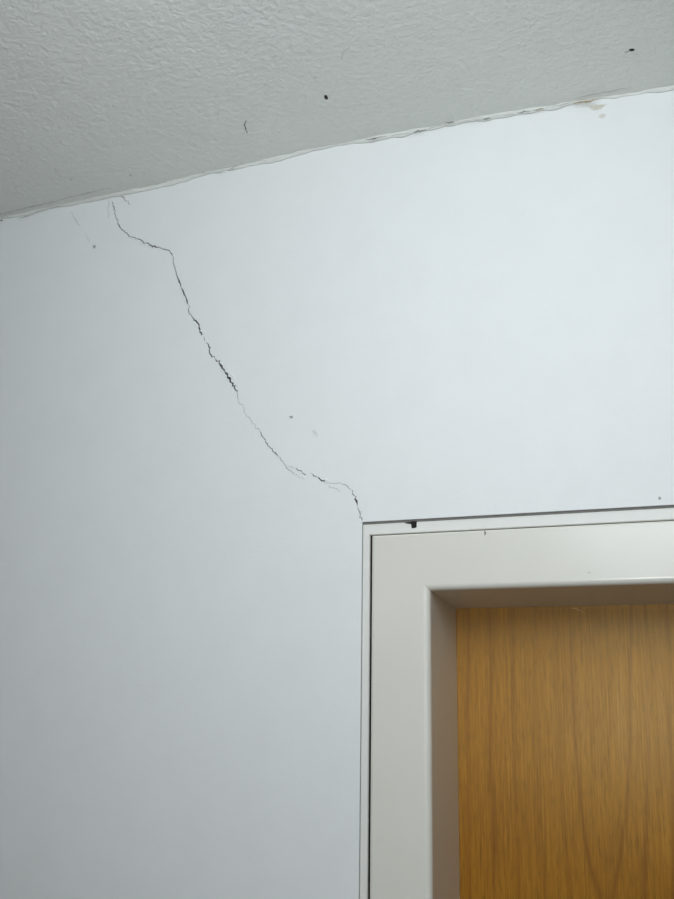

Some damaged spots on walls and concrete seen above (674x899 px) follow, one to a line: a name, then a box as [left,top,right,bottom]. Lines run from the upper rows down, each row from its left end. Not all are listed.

crack [0,188,362,519]